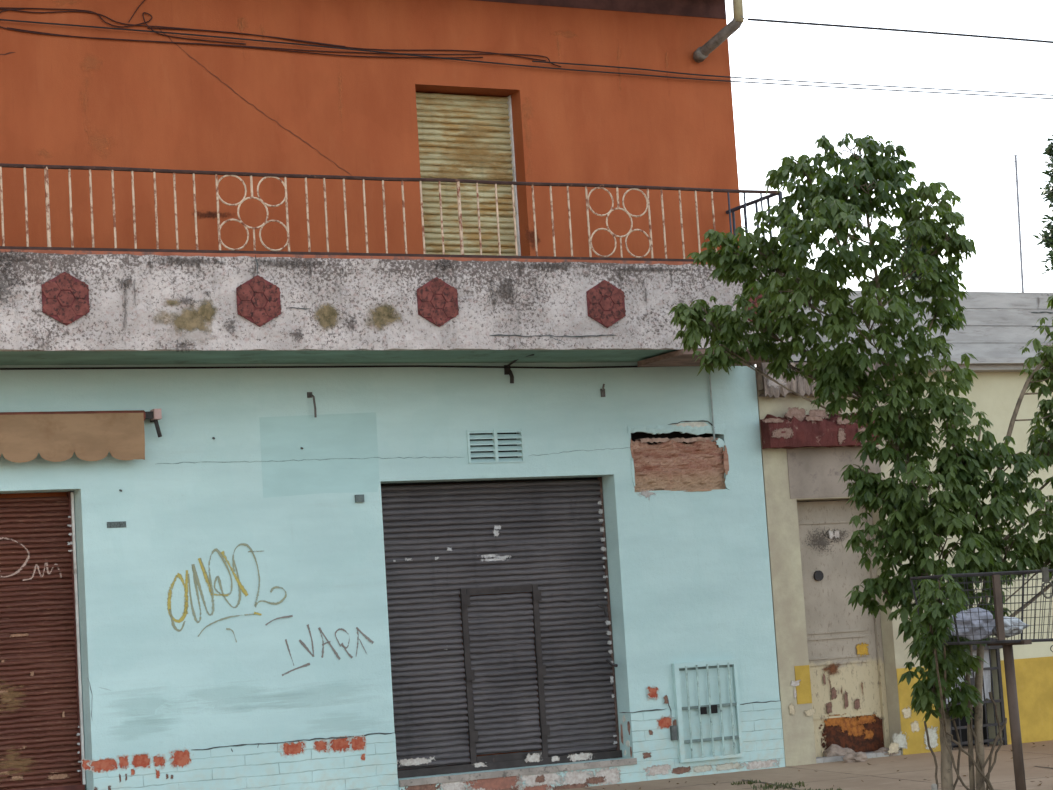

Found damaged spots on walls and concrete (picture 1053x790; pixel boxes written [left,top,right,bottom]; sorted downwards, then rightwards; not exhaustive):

leakage [0,249,36,314]
leakage [117,277,136,327]
leakage [148,257,223,276]
leakage [155,292,216,352]
leakage [253,259,330,277]
leakage [315,304,401,332]
spalling [763,407,867,446]
flaking render [628,420,731,493]
peeling [647,686,677,735]
peeling [46,726,192,790]
peeling [278,734,367,761]
peeling [397,752,622,790]